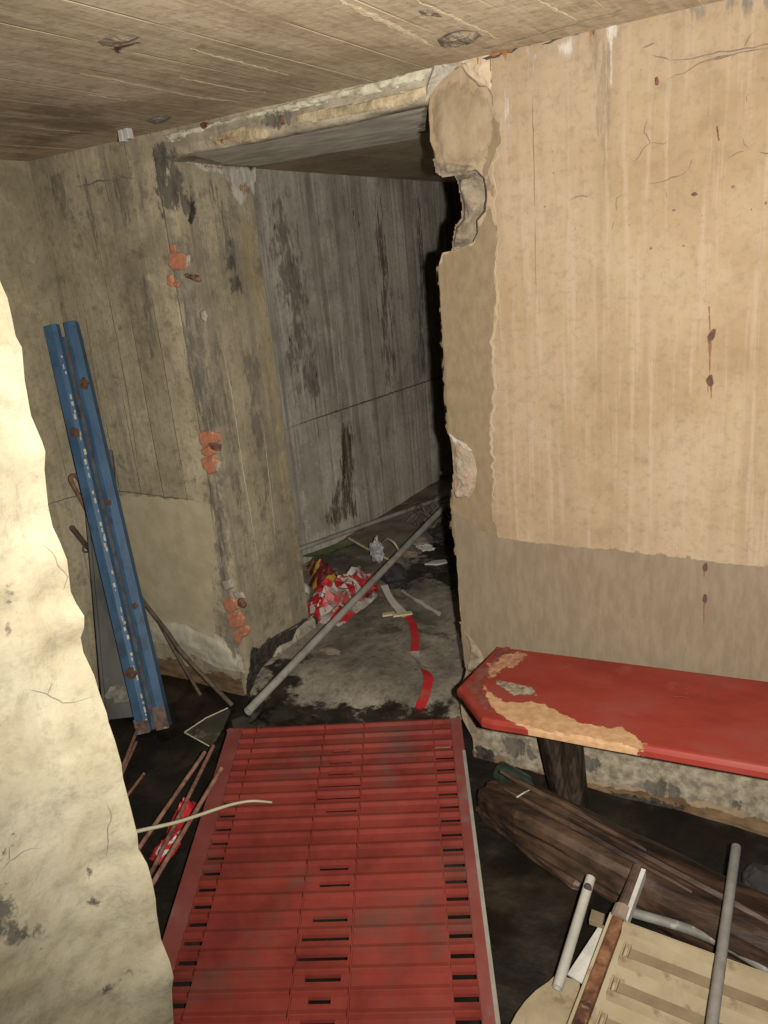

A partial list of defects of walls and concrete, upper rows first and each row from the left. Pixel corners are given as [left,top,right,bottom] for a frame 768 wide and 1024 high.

crack [642,33,768,78]
damp [153,107,425,224]
crack [635,119,665,161]
peeling [433,117,502,556]
rust [706,306,716,396]
damp [401,512,768,682]
damp [157,616,523,764]
spalling [460,622,485,672]
damp [587,783,768,837]